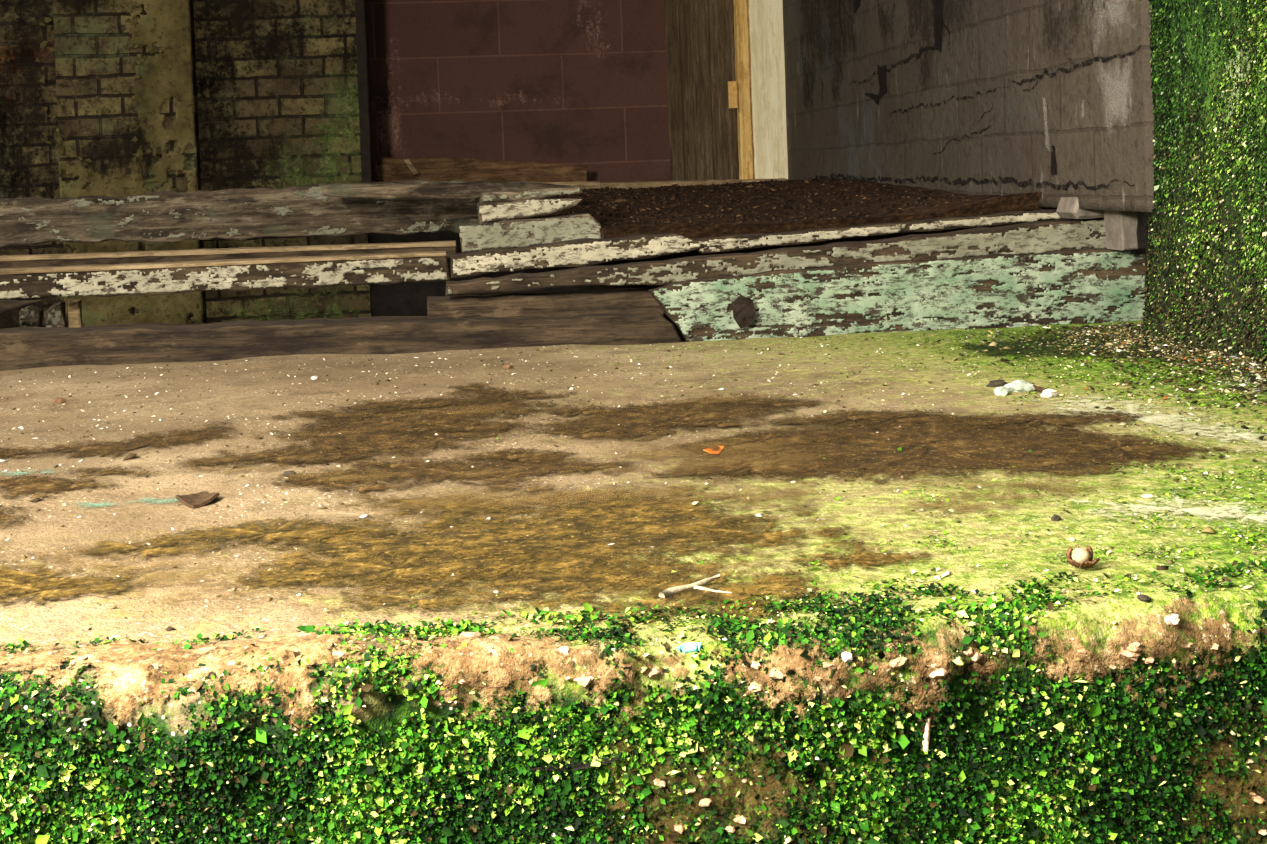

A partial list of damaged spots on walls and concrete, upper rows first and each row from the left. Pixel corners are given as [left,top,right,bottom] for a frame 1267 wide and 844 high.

leakage [0,0,108,199]
leakage [82,110,155,180]
leakage [193,0,408,191]
crack [806,0,950,97]
crack [807,45,1141,190]
peeling [0,186,1146,342]